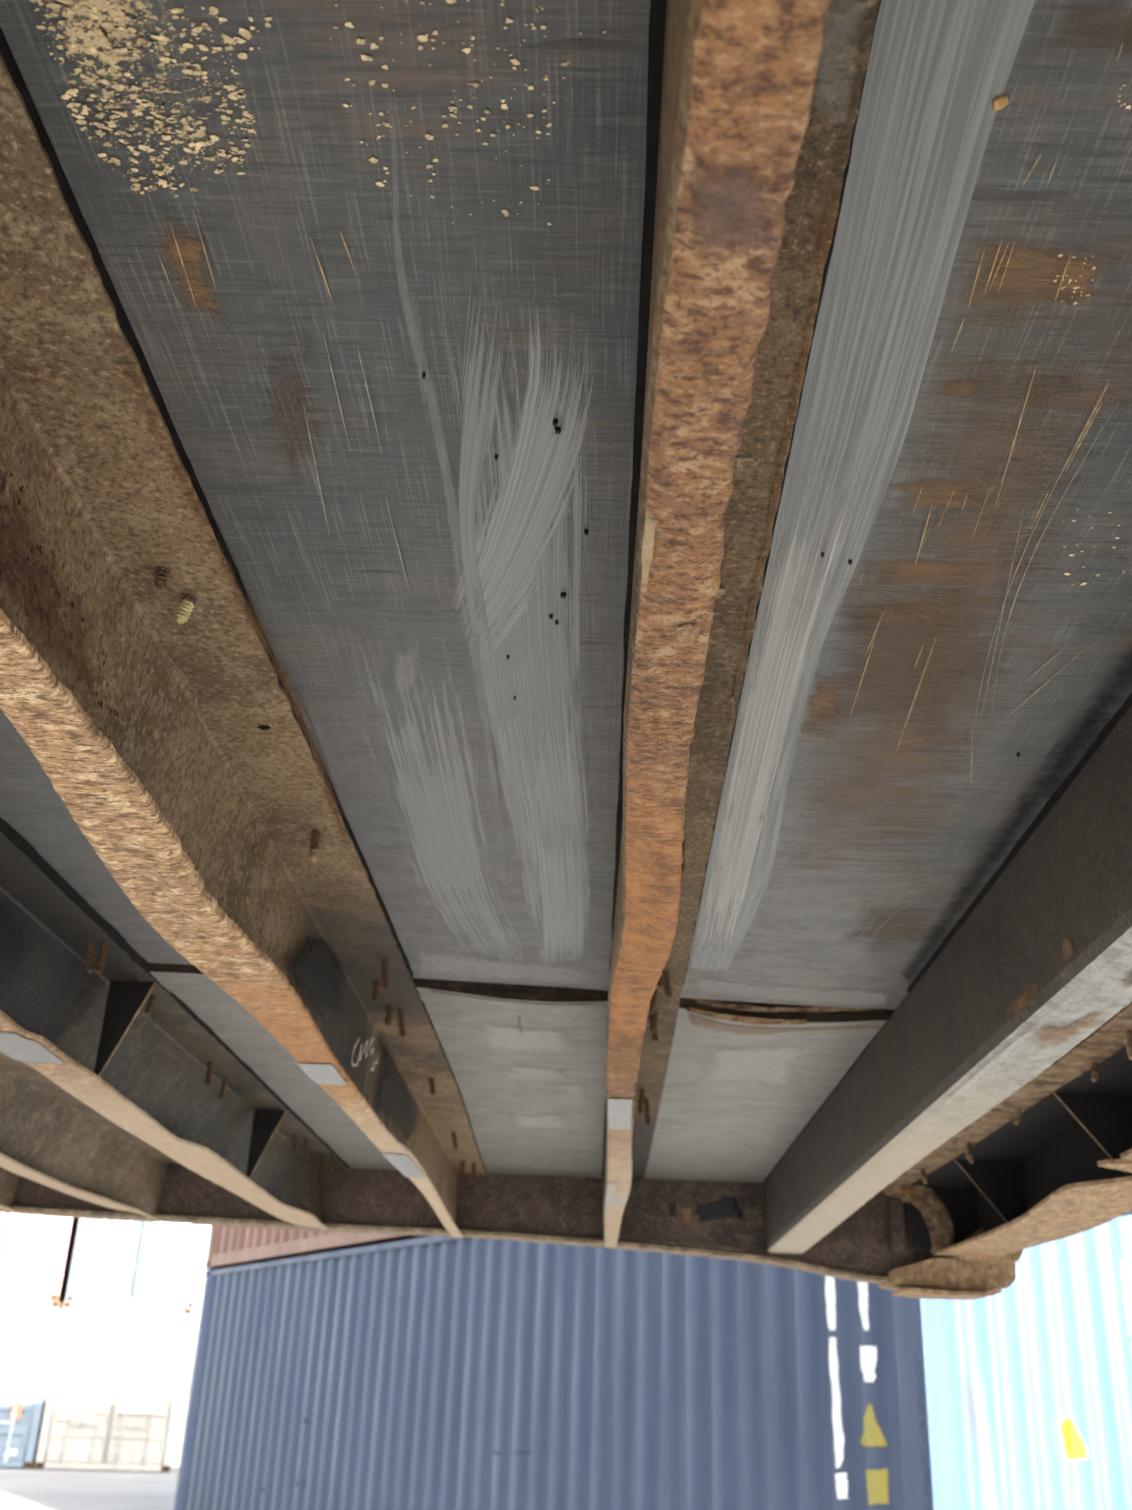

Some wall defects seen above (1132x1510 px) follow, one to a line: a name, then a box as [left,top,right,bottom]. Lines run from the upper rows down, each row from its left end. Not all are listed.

peeling [30,0,272,197]
peeling [360,88,431,194]
peeling [330,22,475,92]
peeling [406,0,570,198]
peeling [155,211,218,308]